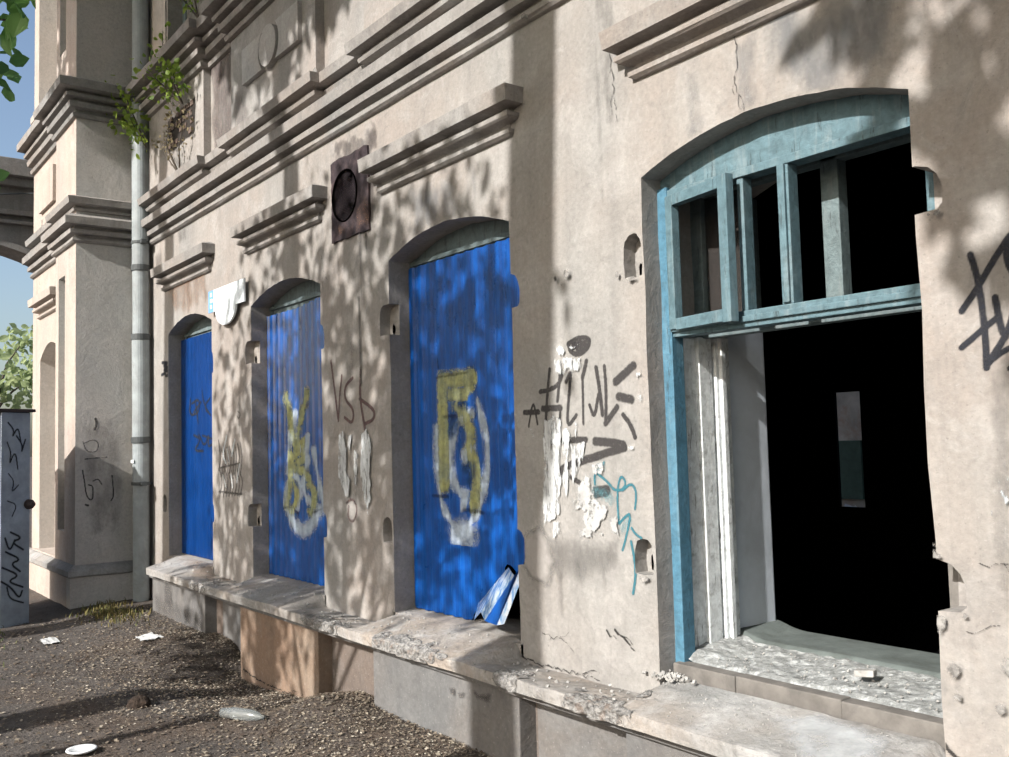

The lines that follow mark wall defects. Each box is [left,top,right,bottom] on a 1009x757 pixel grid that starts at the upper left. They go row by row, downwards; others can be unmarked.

peeling [573,463,618,538]
spalling [937,616,946,632]
spalling [371,631,447,664]
spalling [485,669,534,692]
spalling [561,688,652,725]